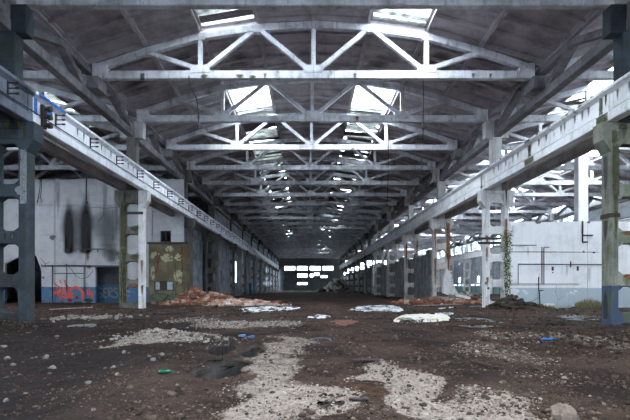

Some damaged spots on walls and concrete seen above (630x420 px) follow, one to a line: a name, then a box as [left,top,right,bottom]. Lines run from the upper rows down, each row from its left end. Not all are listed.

water stain [64,207,73,253]
water stain [81,204,91,269]